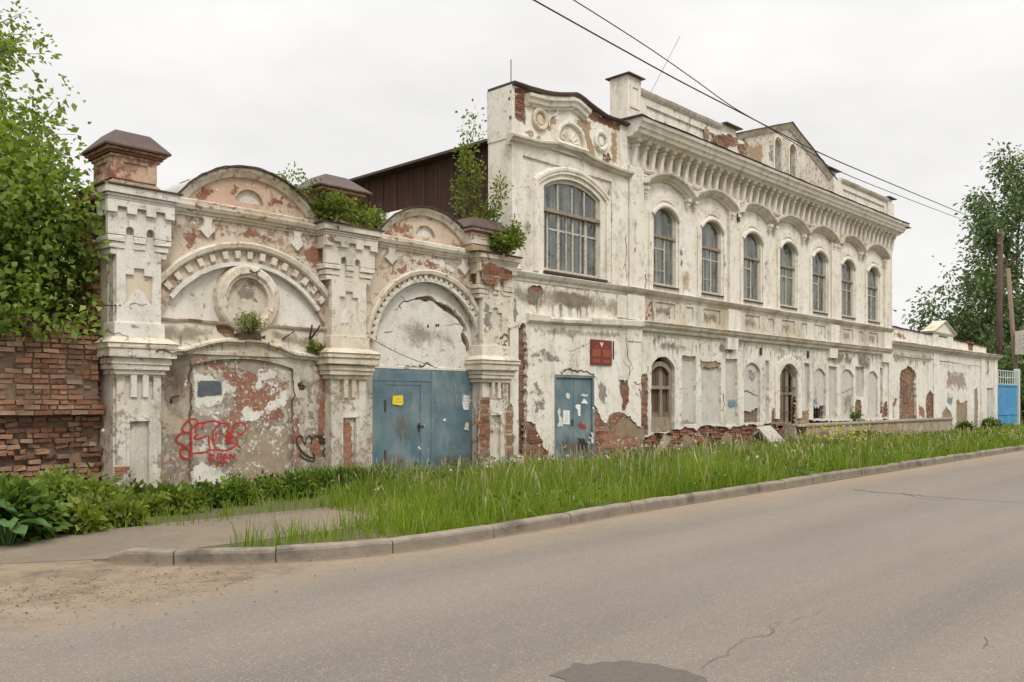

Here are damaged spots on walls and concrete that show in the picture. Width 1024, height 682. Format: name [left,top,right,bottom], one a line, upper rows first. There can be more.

flaking render [508,87,559,140]
flaking render [577,106,632,163]
flaking render [704,127,749,156]
flaking render [196,178,255,201]
flaking render [467,261,520,287]
flaking render [164,356,326,477]
flaking render [474,285,571,464]
flaking render [591,373,809,460]
flaking render [880,366,978,429]